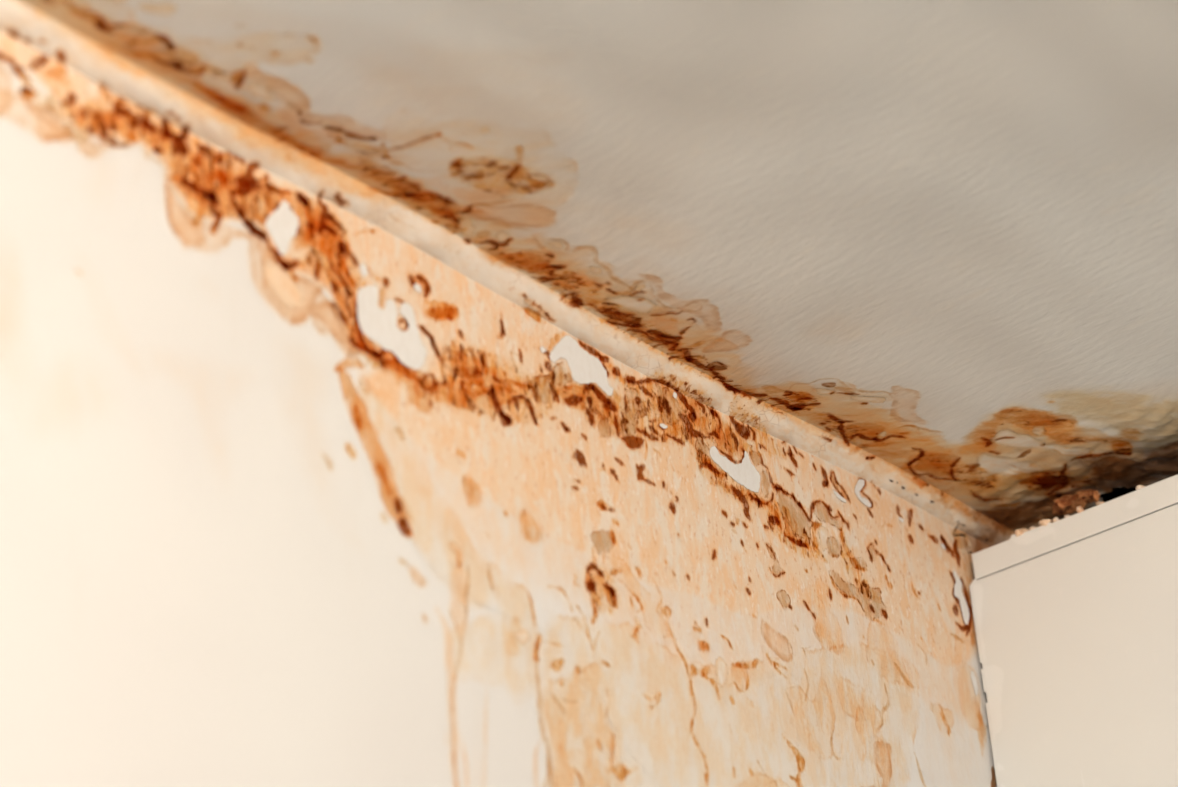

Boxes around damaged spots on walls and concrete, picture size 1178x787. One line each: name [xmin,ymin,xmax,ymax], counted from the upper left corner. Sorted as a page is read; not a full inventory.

peeling [265,200,299,255]
peeling [357,264,427,371]
peeling [540,335,613,396]
peeling [710,446,760,492]
peeling [834,478,871,507]
damp [398,517,411,536]
damp [947,540,960,567]
peeling [953,571,969,625]
damp [956,587,972,636]
damp [715,657,728,687]